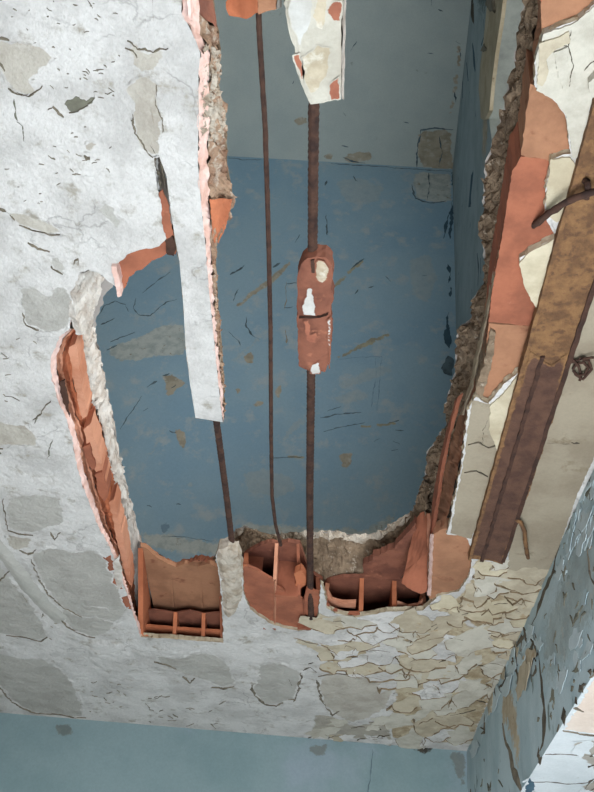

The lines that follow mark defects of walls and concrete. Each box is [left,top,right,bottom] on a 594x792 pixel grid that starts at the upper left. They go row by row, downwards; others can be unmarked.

peeling [0,208,67,237]
spalling [0,242,151,642]
spalling [159,189,173,240]
spalling [234,0,570,581]
flaking render [291,298,594,792]
rust [470,352,568,564]